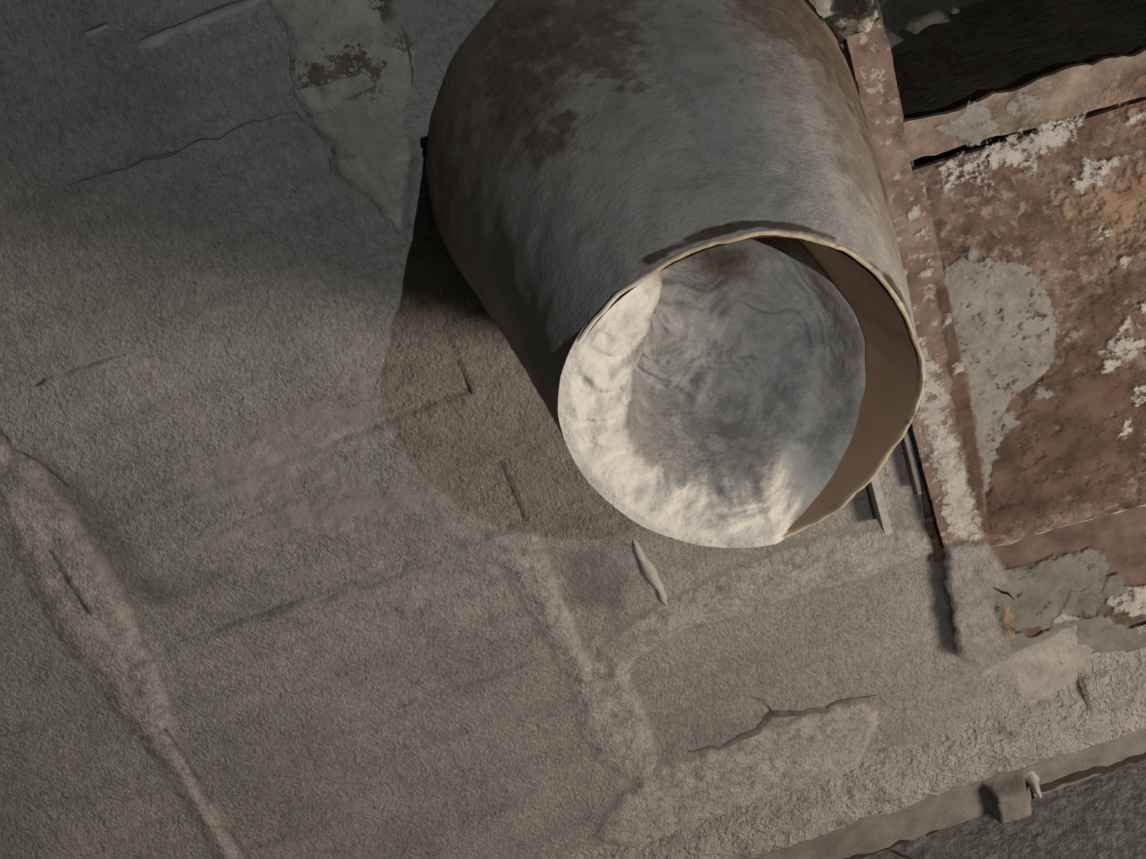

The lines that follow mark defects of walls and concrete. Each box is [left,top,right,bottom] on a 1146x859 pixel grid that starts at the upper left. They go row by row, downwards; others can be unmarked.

flaking render [267,0,428,232]
corrosion [1050,163,1146,336]
corrosion [938,288,1146,541]
crack [688,695,876,753]